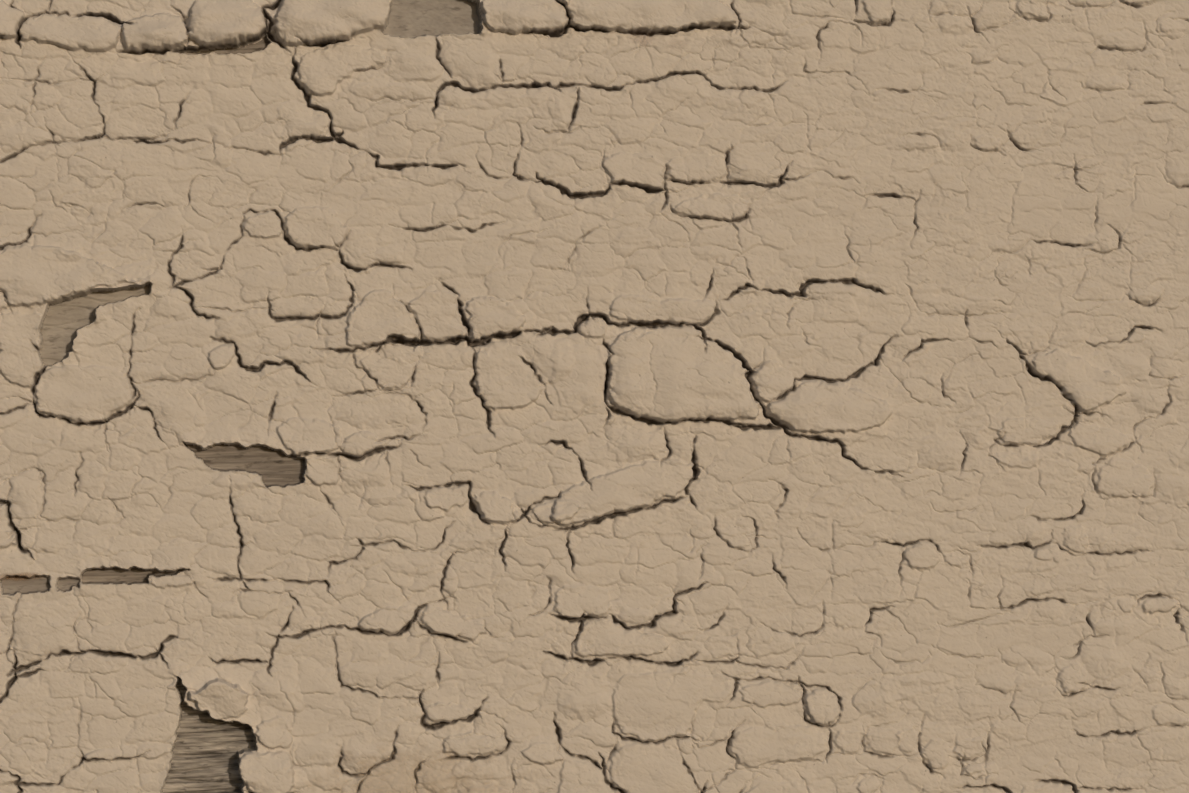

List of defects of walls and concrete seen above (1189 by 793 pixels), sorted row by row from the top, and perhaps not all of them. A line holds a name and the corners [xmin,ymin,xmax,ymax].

peeling [378,0,486,41]
crack [0,593,178,793]
peeling [35,280,154,370]
peeling [0,562,193,598]
crack [106,467,143,525]
peeling [159,675,260,793]
peeling [179,439,311,493]
crack [179,435,700,793]
crack [0,0,985,520]
crack [527,356,1189,793]
crack [902,284,1110,496]
crack [923,0,1189,349]